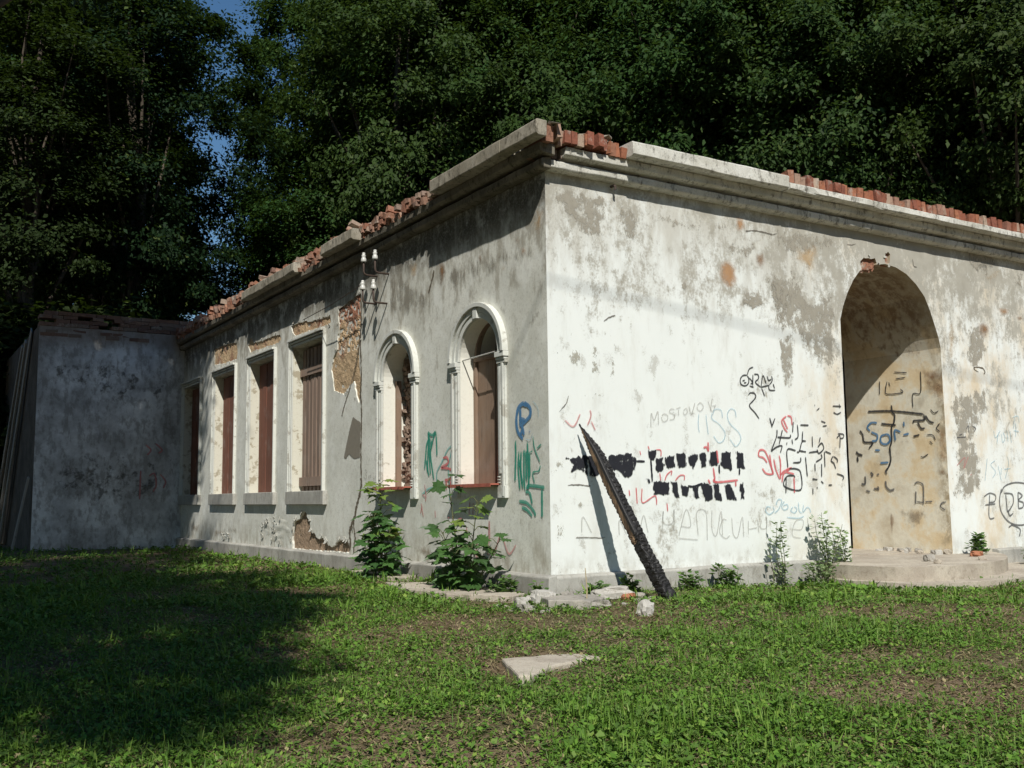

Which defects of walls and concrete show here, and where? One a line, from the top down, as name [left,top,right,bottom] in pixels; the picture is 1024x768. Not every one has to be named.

rust [722,264,734,285]
crack [341,299,362,553]